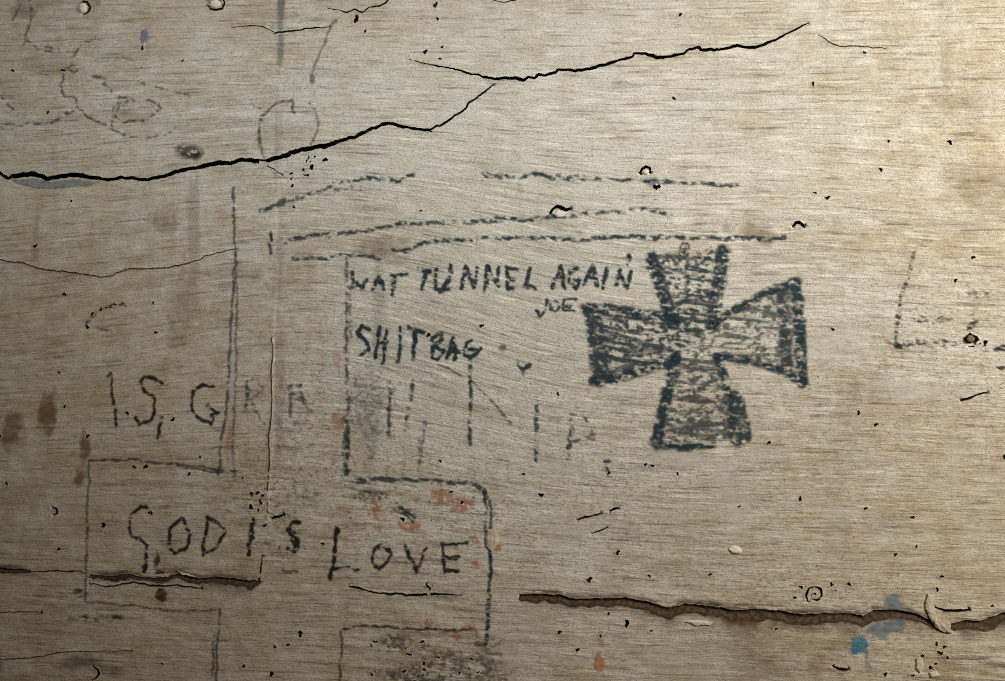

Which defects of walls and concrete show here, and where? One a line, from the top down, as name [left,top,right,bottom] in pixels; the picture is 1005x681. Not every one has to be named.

crack [0,21,887,189]